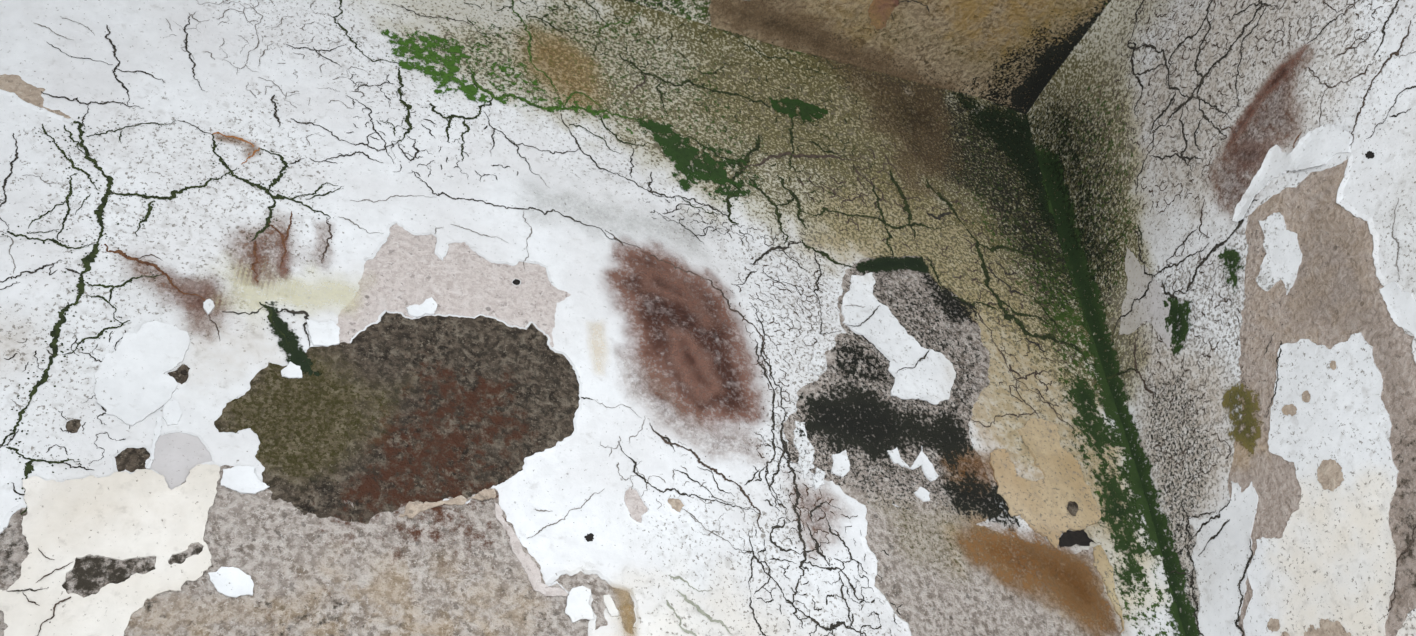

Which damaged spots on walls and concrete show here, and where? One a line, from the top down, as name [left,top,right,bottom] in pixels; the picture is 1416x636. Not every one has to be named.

spalling [708,0,1111,113]
water stain [714,0,1110,287]
crack [1089,0,1416,424]
corrosion [1211,46,1308,212]
spalling [62,221,640,636]
crack [0,0,1100,636]
corrosion [606,244,762,439]
water stain [793,340,1025,532]
spalling [1228,124,1416,636]
spalling [0,504,29,590]
corrosion [957,526,1116,636]
crack [1172,498,1231,636]